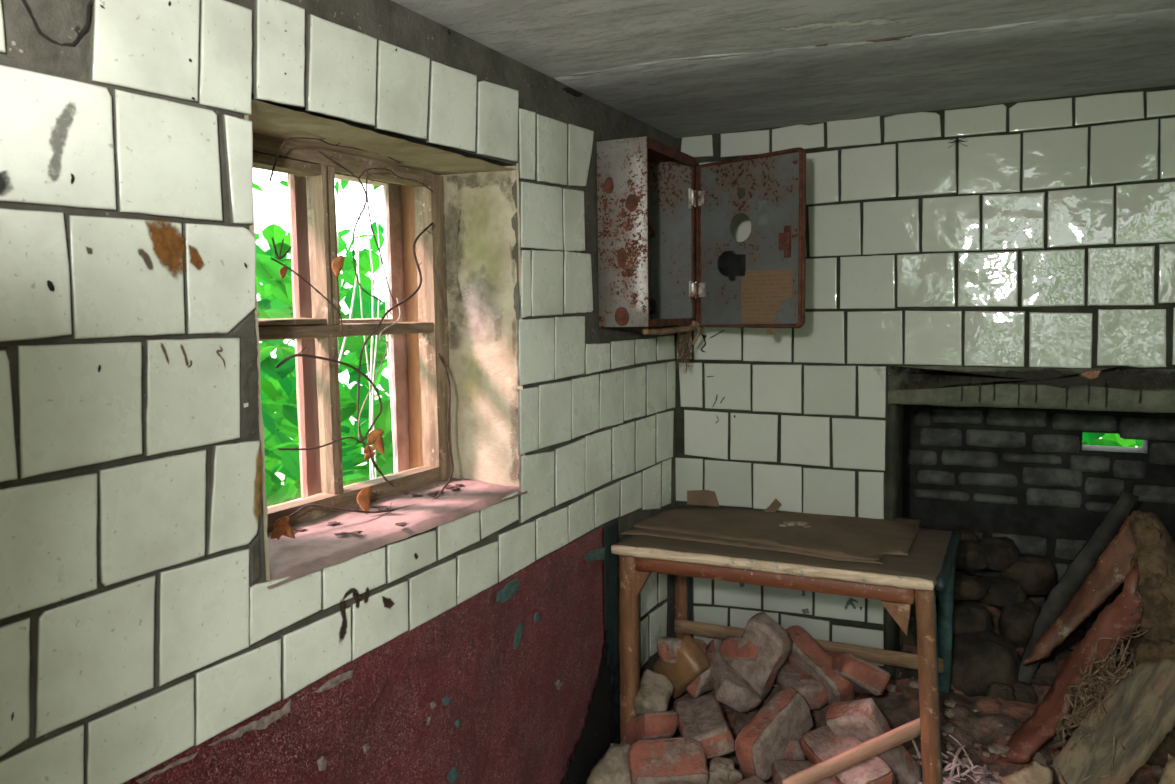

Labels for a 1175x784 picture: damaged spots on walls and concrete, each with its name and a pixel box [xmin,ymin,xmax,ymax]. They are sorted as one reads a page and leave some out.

peeling [3,0,105,77]
corrosion [138,219,205,277]
peeling [312,670,353,693]
peeling [136,699,291,784]
peeling [317,756,327,771]